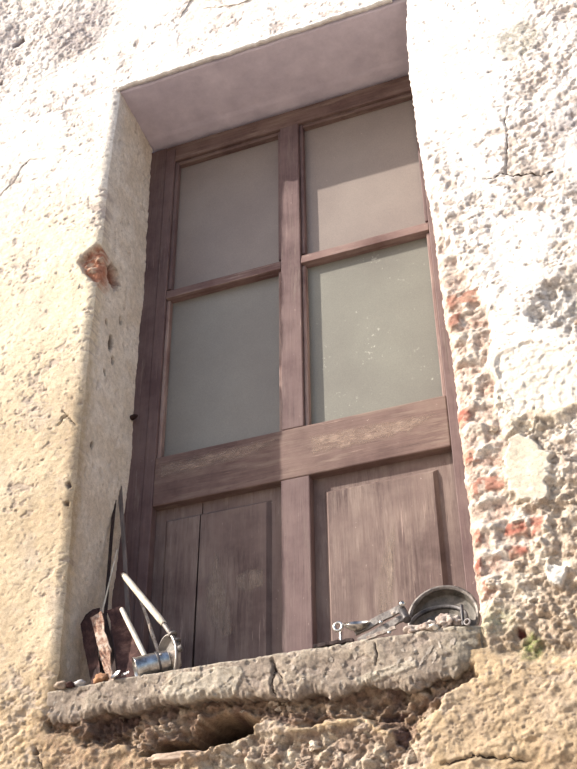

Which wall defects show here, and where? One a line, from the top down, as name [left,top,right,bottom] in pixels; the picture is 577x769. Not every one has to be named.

crack [485,104,554,180]
spalling [79,244,122,292]
spalling [416,122,577,660]
spalling [40,660,479,769]
crack [270,662,283,695]
crack [443,754,528,765]